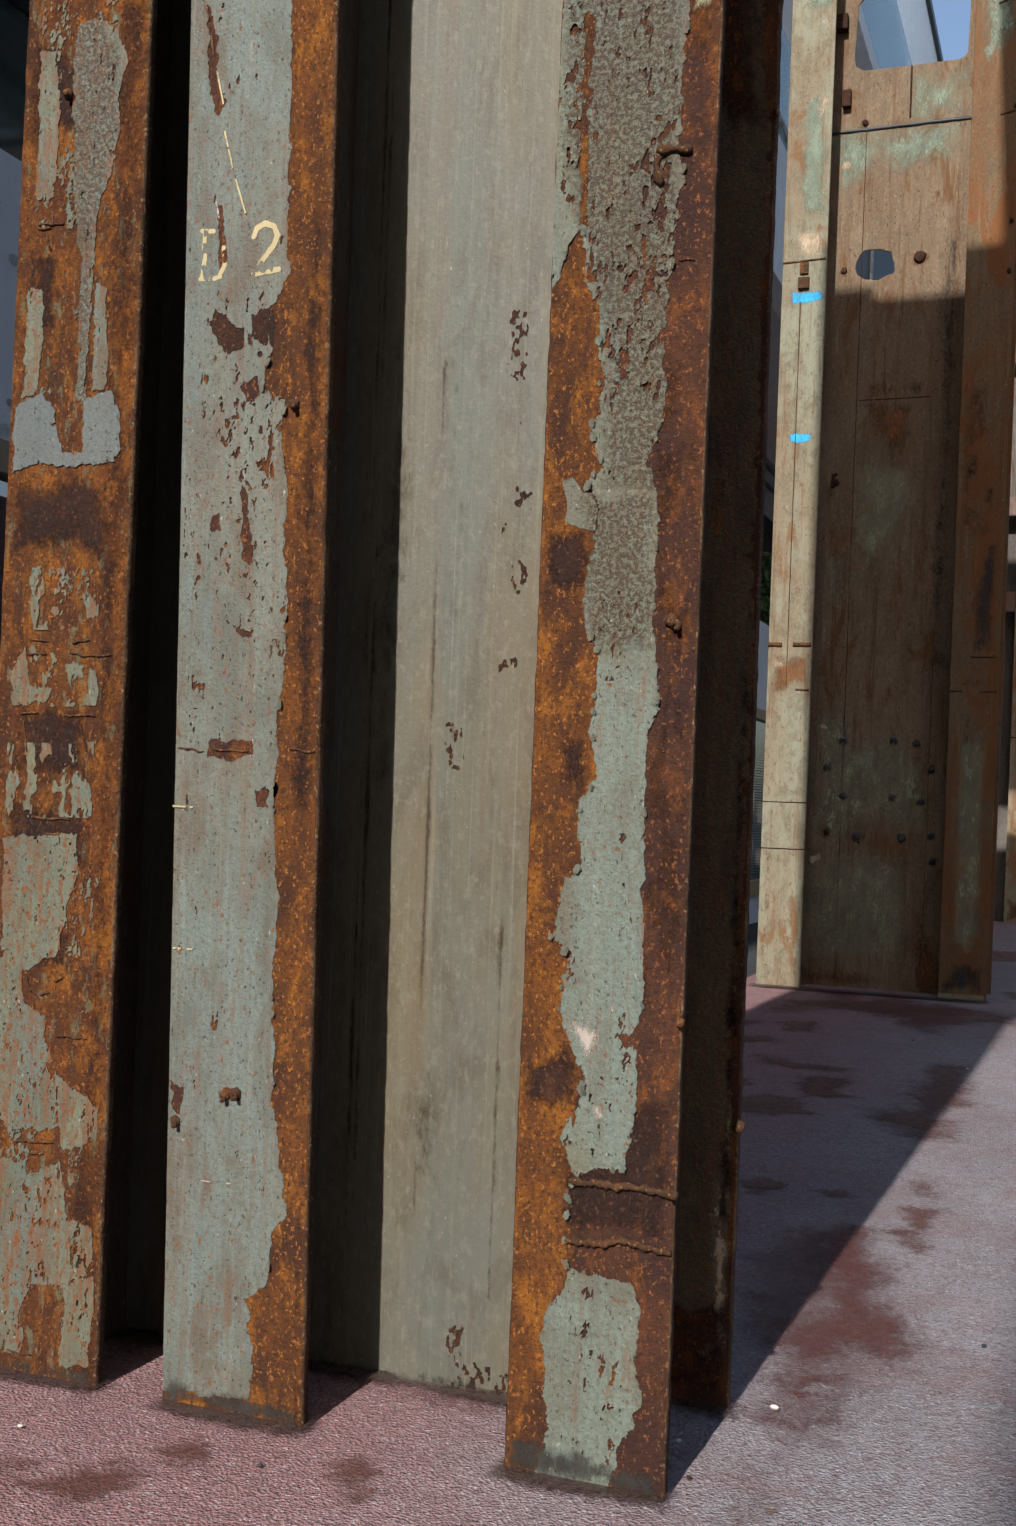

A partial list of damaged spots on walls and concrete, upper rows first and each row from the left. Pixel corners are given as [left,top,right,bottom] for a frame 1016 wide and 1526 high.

peeling [21,0,129,402]
corrosion [31,0,143,403]
corrosion [559,10,598,233]
corrosion [15,709,85,776]
peeling [8,566,99,707]
peeling [163,0,335,1432]
peeling [505,0,773,1503]
peeling [0,742,100,1369]
corrosion [526,1054,666,1237]
water stain [742,951,1016,1115]
water stain [863,1065,969,1140]
water stain [747,1183,944,1395]